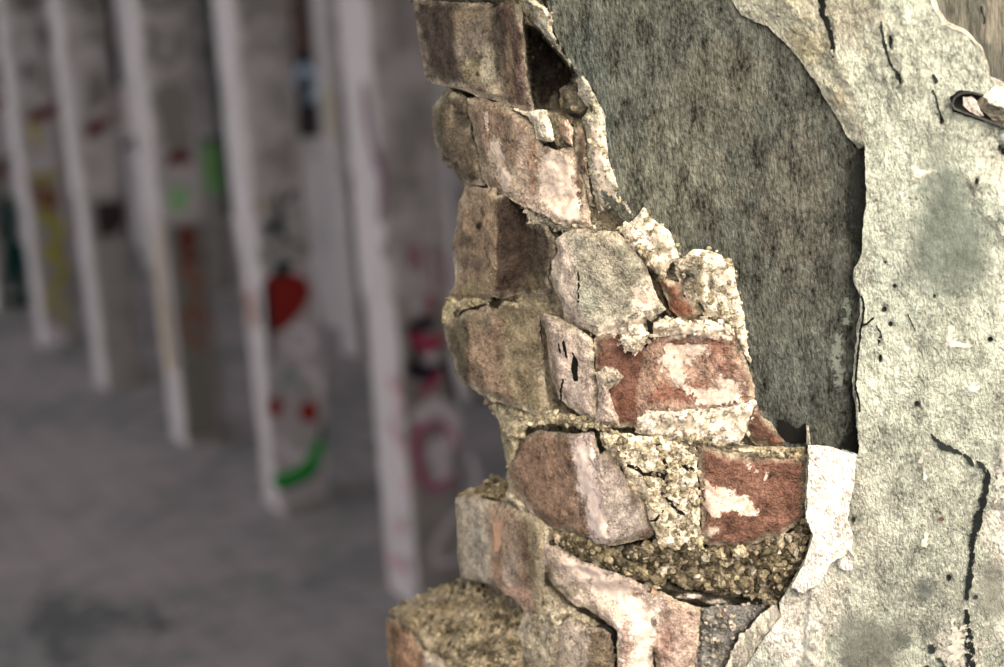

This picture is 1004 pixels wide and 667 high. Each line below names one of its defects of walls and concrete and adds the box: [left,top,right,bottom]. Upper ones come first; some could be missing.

crack [818,0,838,58]
peeling [930,0,1004,128]
spalling [385,0,867,667]
crack [930,434,987,474]